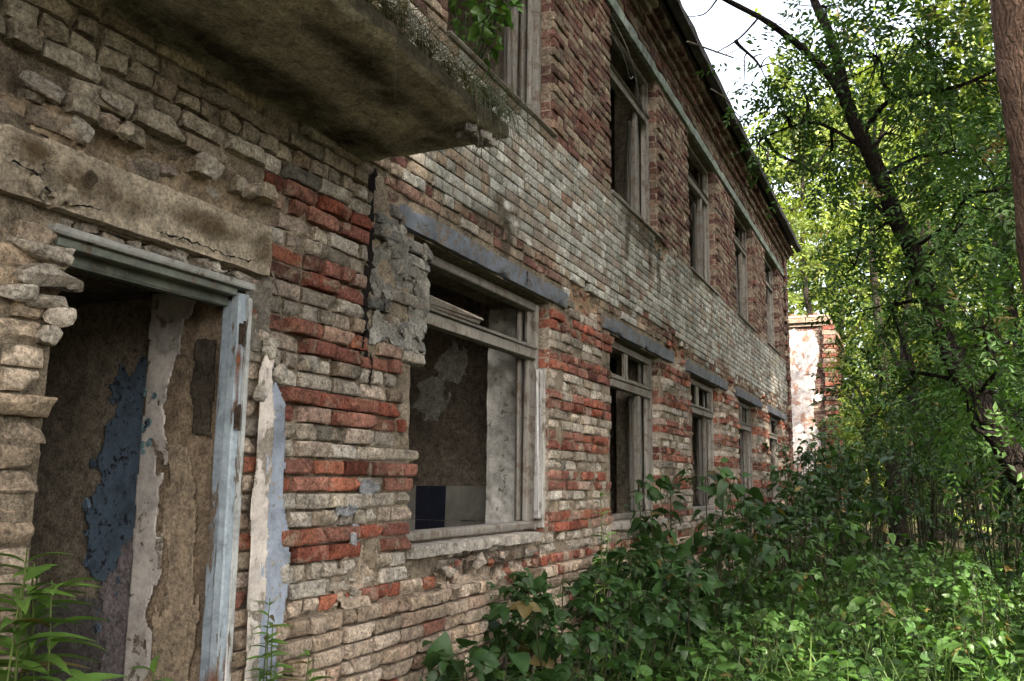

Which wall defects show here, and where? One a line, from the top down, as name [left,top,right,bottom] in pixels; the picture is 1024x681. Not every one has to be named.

crack [12,159,101,210]
crack [157,231,257,263]
crack [353,168,386,387]
spalling [368,223,468,421]
peeling [18,293,223,681]
peeling [244,275,293,681]